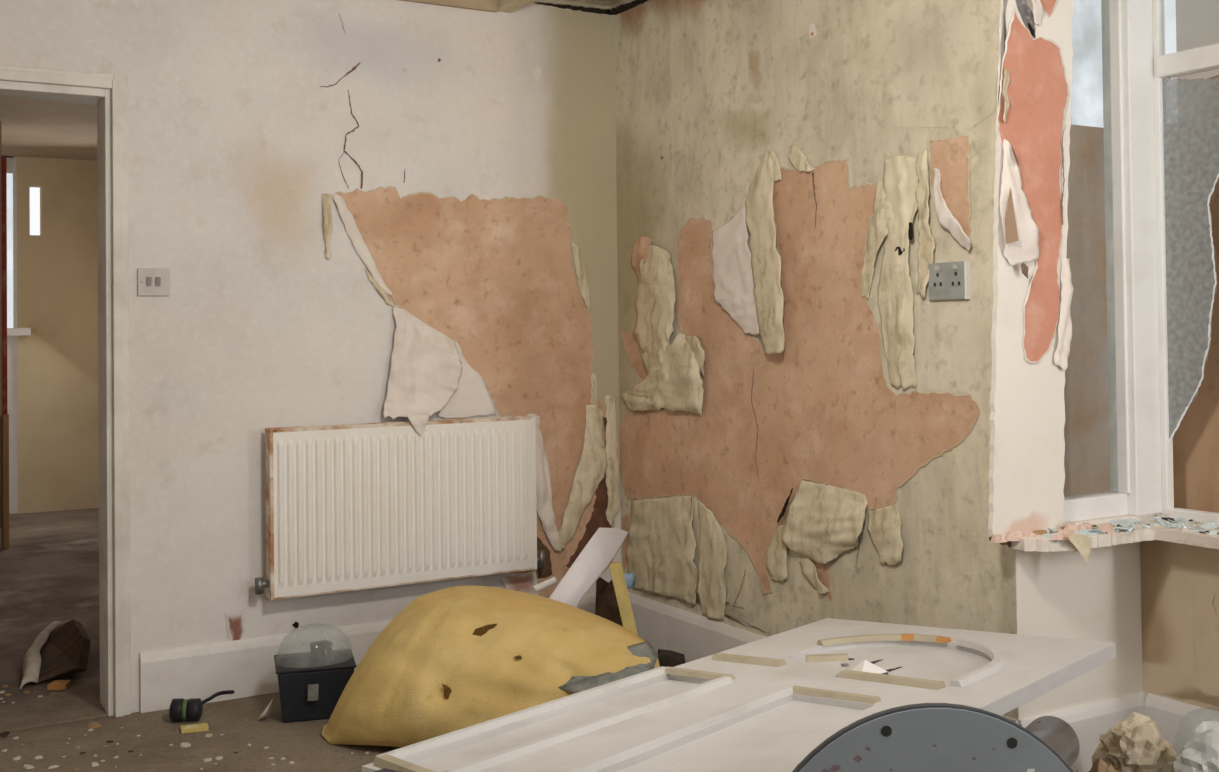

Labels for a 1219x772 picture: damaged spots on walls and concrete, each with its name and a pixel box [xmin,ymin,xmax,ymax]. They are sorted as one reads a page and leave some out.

crack [320,62,363,189]
flaking render [931,136,970,237]
flaking render [997,0,1073,370]
flaking render [339,160,980,601]